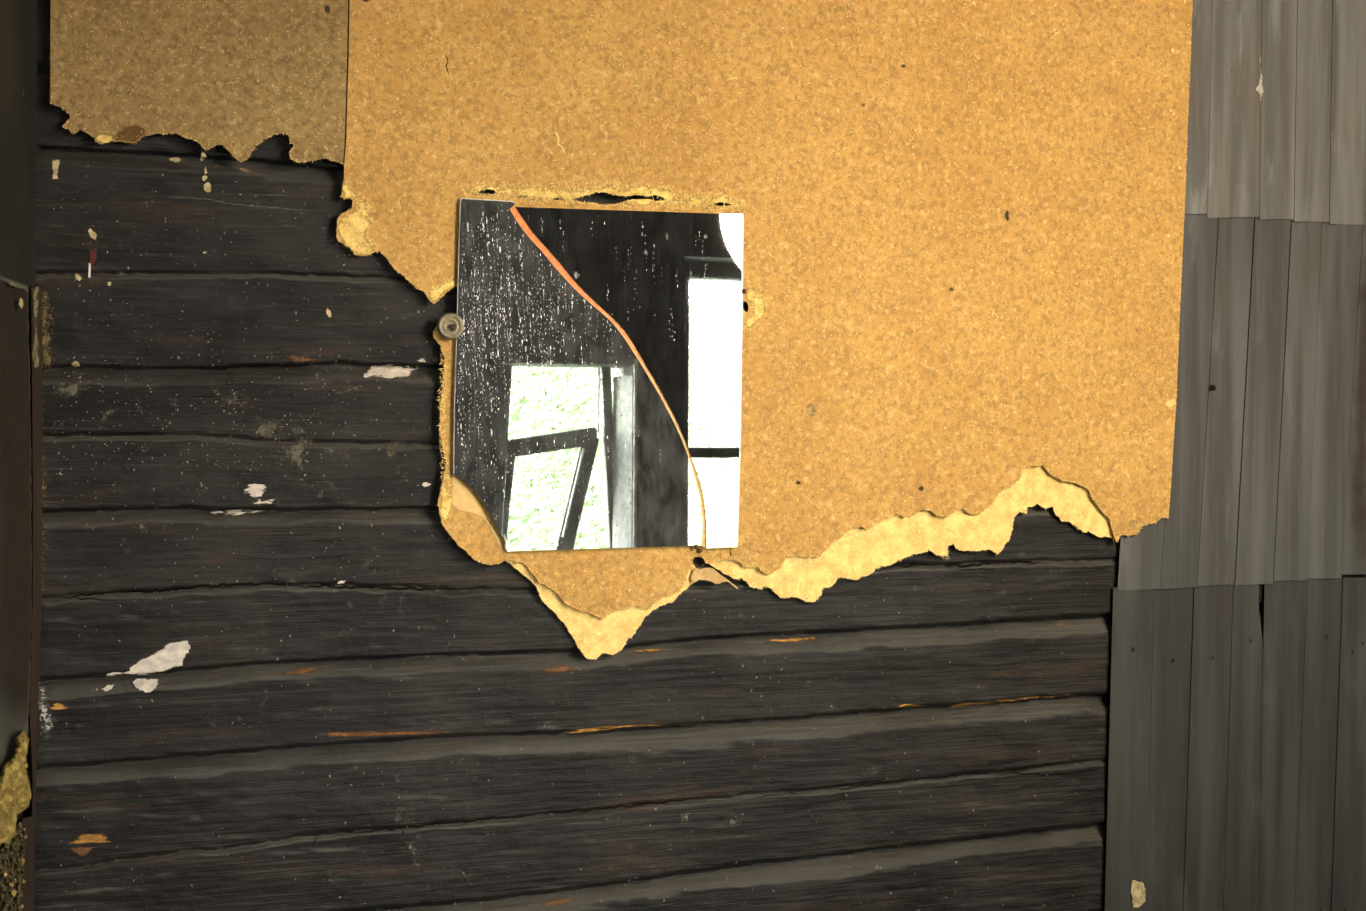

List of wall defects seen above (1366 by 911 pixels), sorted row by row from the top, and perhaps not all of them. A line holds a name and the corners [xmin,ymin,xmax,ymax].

peeling [211,499,274,515]
peeling [505,465,1116,660]
spalling [0,821,26,911]